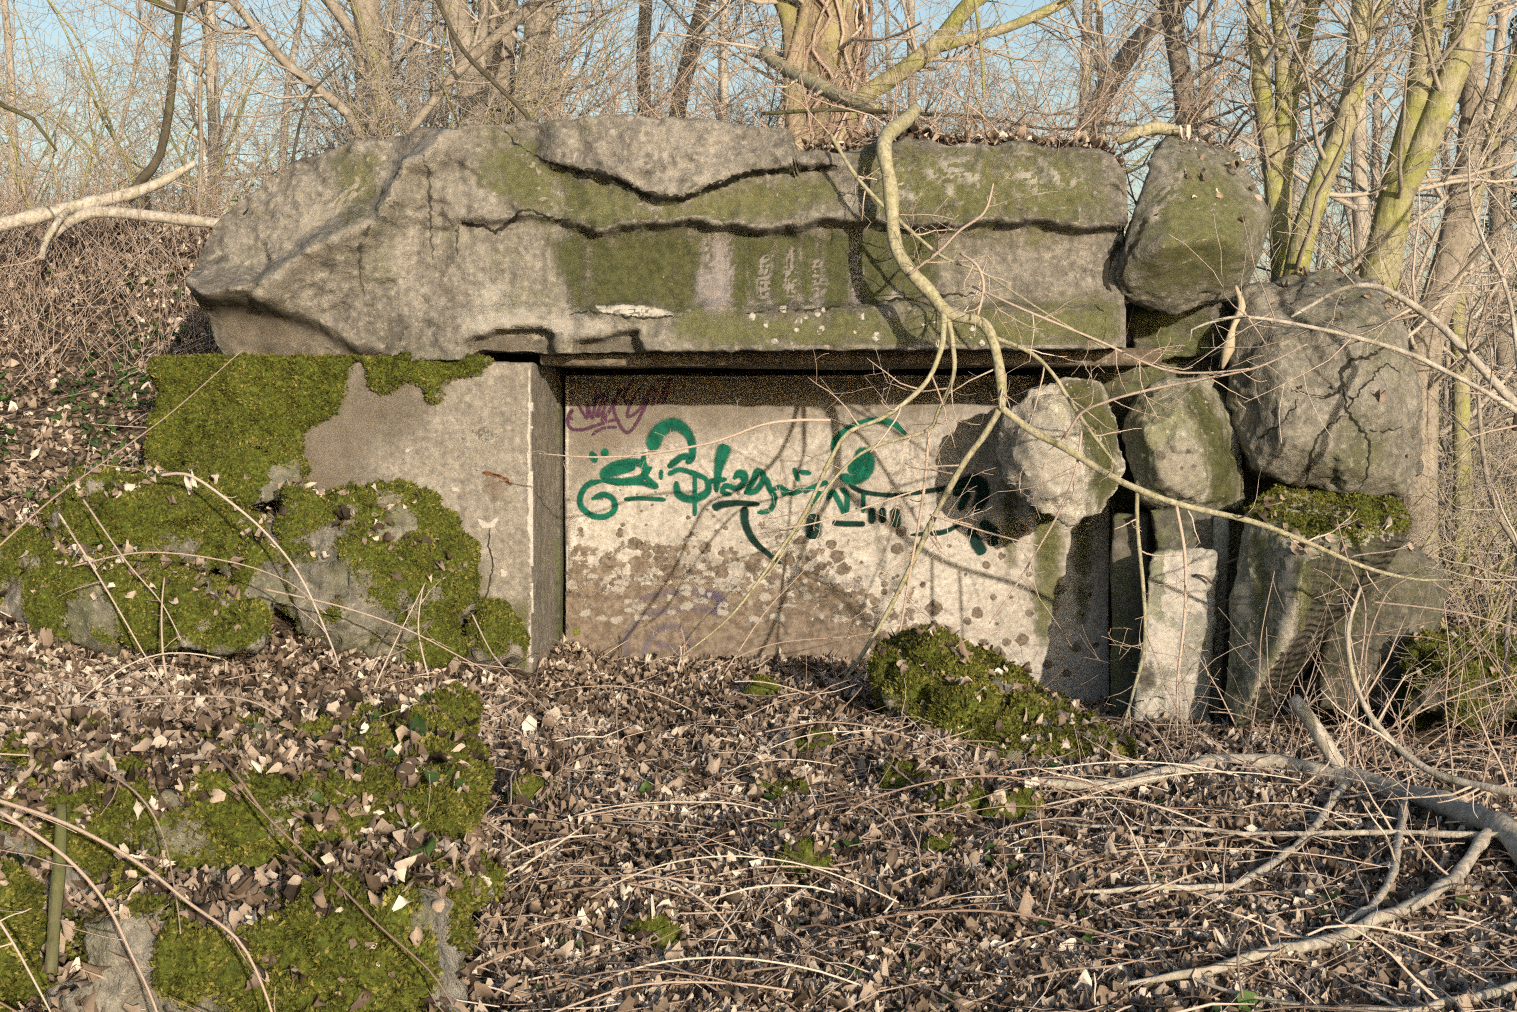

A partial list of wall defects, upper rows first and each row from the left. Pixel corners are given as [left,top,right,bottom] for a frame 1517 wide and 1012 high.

damp [458,281,673,339]
damp [548,236,584,299]
damp [696,231,938,344]
crack [1256,347,1402,489]
damp [1002,403,1091,639]